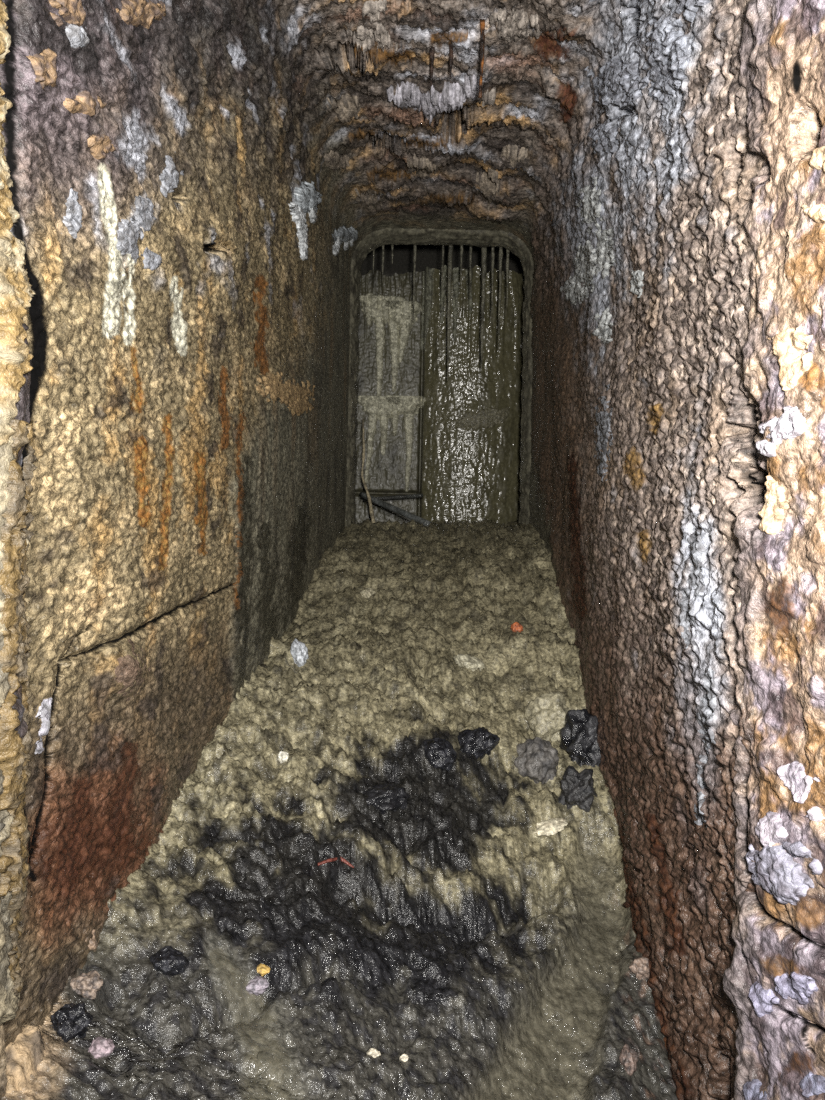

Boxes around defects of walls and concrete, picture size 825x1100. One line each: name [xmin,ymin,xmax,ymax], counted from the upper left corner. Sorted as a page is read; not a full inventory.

crack [3,0,47,481]
damp [98,163,136,345]
corrosion [131,347,145,413]
corrosion [134,414,175,570]
damp [170,277,187,356]
corrosion [193,452,208,556]
corrosion [218,367,246,547]
corrosion [253,275,269,374]
crack [23,583,233,882]